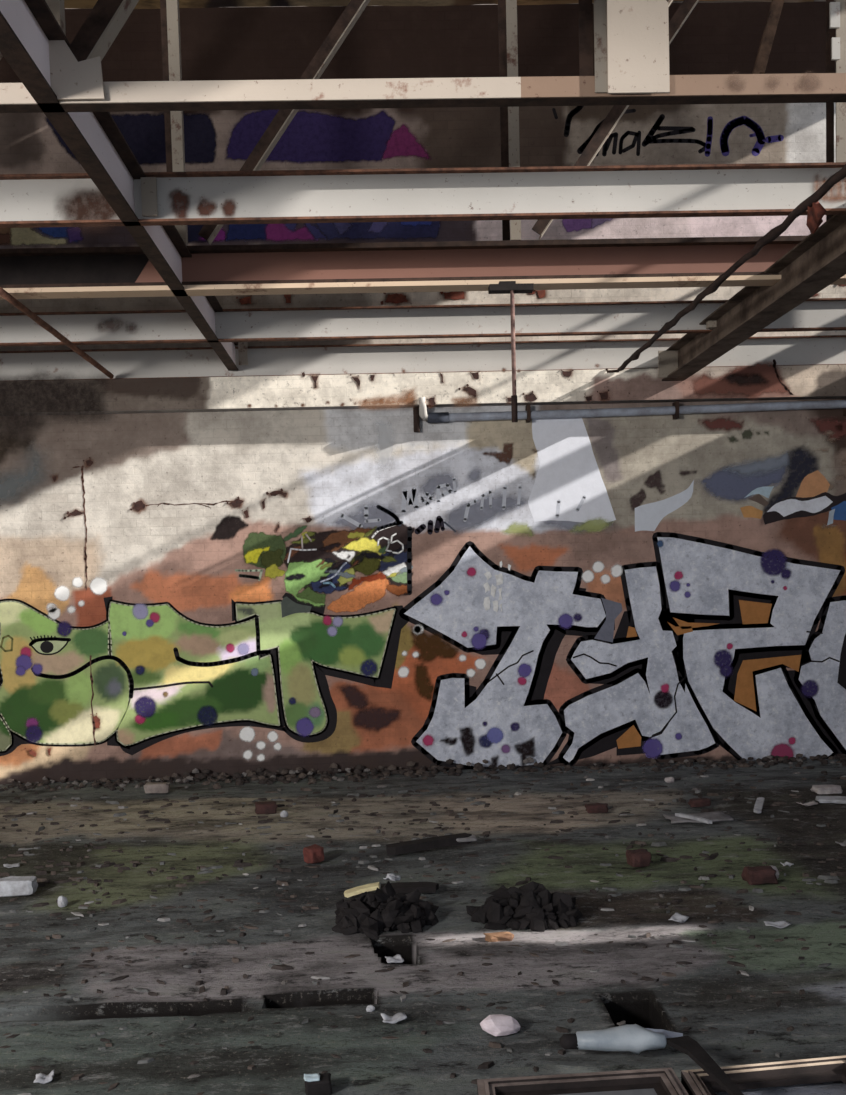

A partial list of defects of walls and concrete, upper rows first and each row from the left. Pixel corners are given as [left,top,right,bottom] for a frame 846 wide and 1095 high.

corrosion [170,190,235,218]
corrosion [327,391,414,407]
crack [146,500,232,508]
peeling [630,471,664,510]
crack [73,465,88,591]
crack [89,655,97,745]